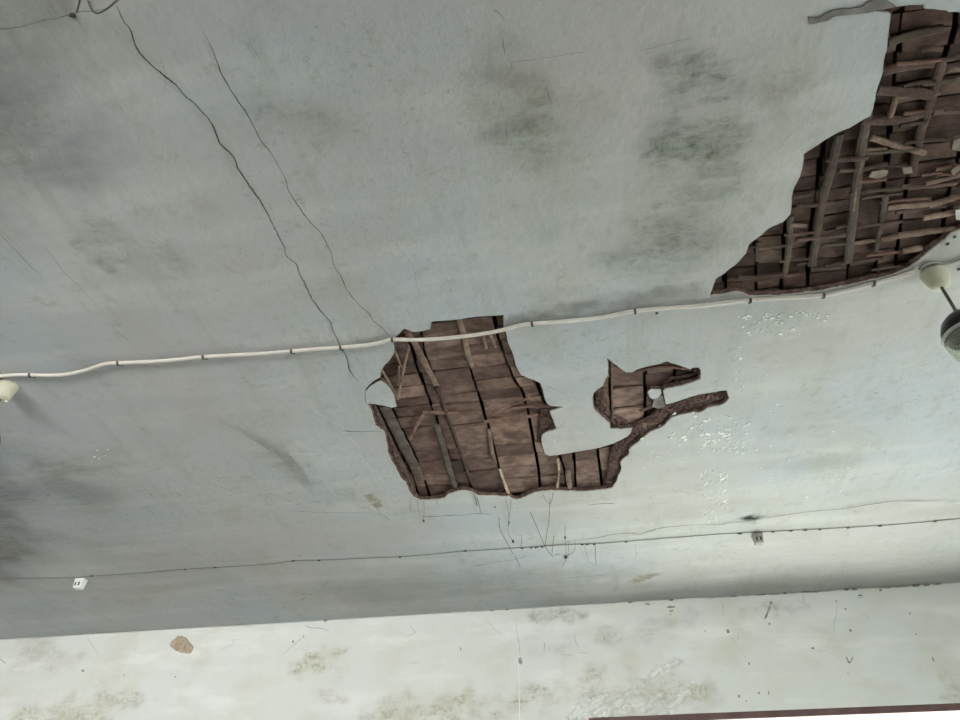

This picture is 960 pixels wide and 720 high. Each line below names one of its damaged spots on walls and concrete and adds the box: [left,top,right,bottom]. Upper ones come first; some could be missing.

crack [119,12,355,378]
crack [210,45,381,327]
flaking render [710,0,960,297]
flaking render [365,315,758,567]
flaking render [170,636,194,654]